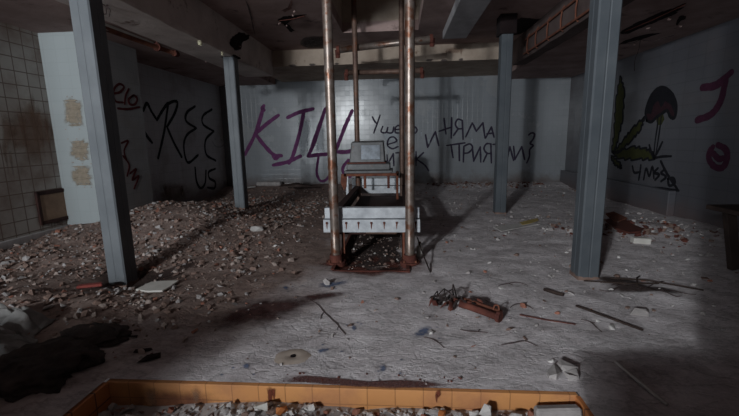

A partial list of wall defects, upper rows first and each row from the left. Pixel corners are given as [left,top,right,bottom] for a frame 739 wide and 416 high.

peeling [65,96,92,188]